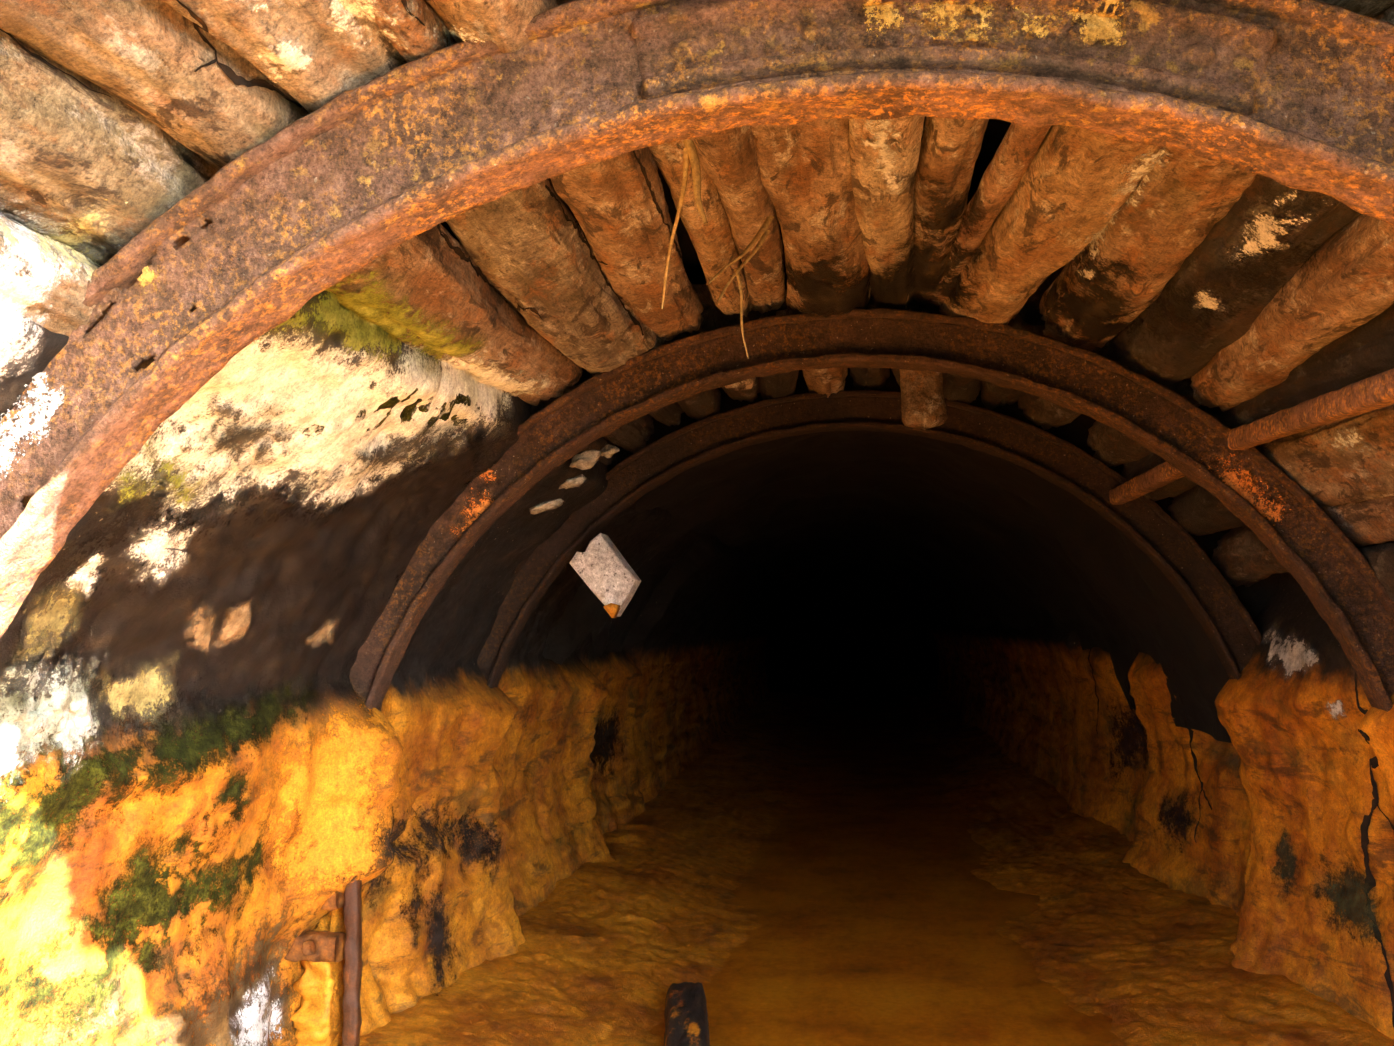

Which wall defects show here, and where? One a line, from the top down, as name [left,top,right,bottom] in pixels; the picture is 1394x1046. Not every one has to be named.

rust [863,0,1126,46]
rust [135,266,163,295]
water stain [0,199,120,480]
rust [450,467,497,537]
rust [1200,453,1293,526]
crack [1354,672,1394,1027]
water stain [62,893,316,1046]
rust [285,961,305,1046]
rust [360,1000,384,1045]